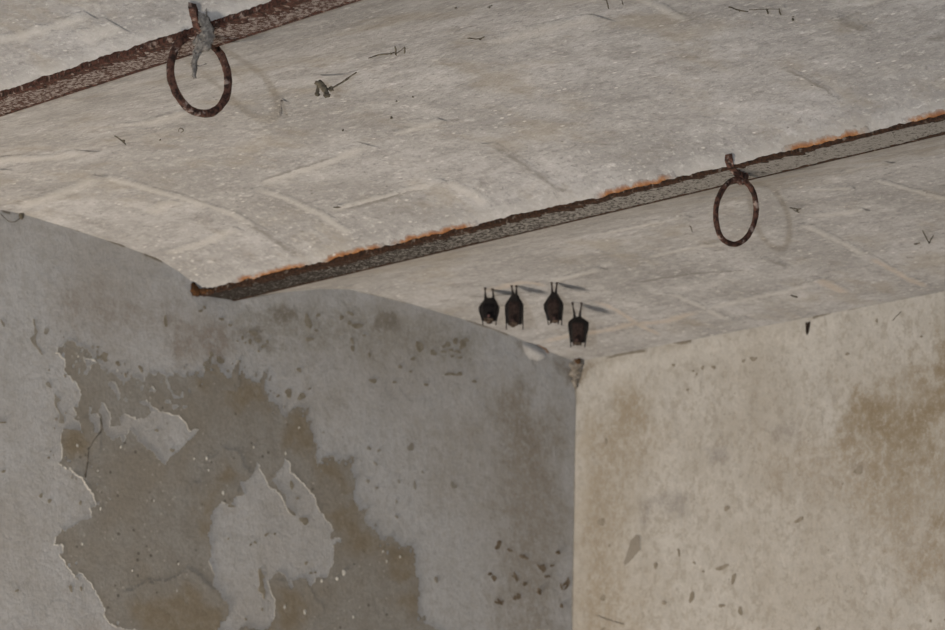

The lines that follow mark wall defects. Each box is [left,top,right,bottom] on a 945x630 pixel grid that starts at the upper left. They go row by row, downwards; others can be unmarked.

corrosion [781,125,870,152]
corrosion [901,109,945,124]
corrosion [593,171,677,199]
corrosion [231,220,479,283]
crack [84,418,103,478]
peeling [30,319,438,630]
leakage [8,260,945,630]